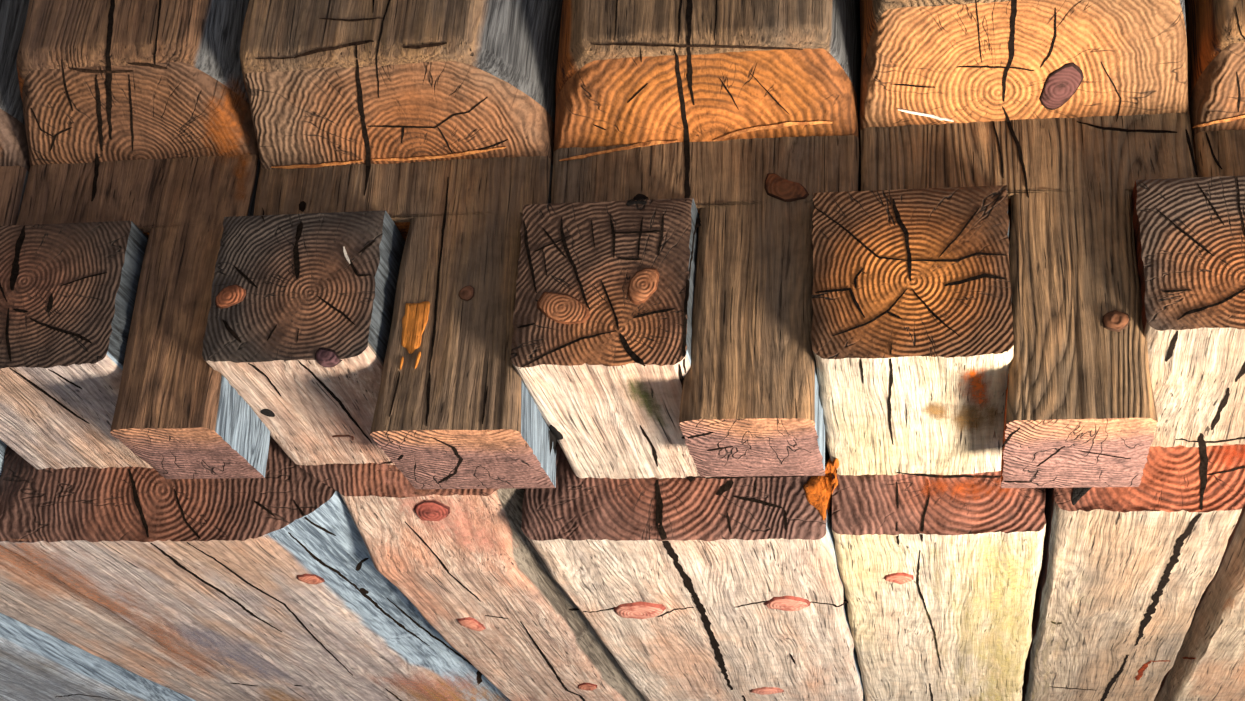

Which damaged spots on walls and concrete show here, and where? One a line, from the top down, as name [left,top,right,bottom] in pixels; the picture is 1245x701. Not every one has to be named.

crack [31,0,162,201]
crack [519,0,789,387]
crack [1077,62,1245,256]
crack [1235,7,1245,39]
crack [810,0,1131,701]
crack [1162,288,1245,362]
crack [128,469,353,676]
crack [569,606,614,614]
crack [640,425,803,701]
crack [1050,363,1245,701]